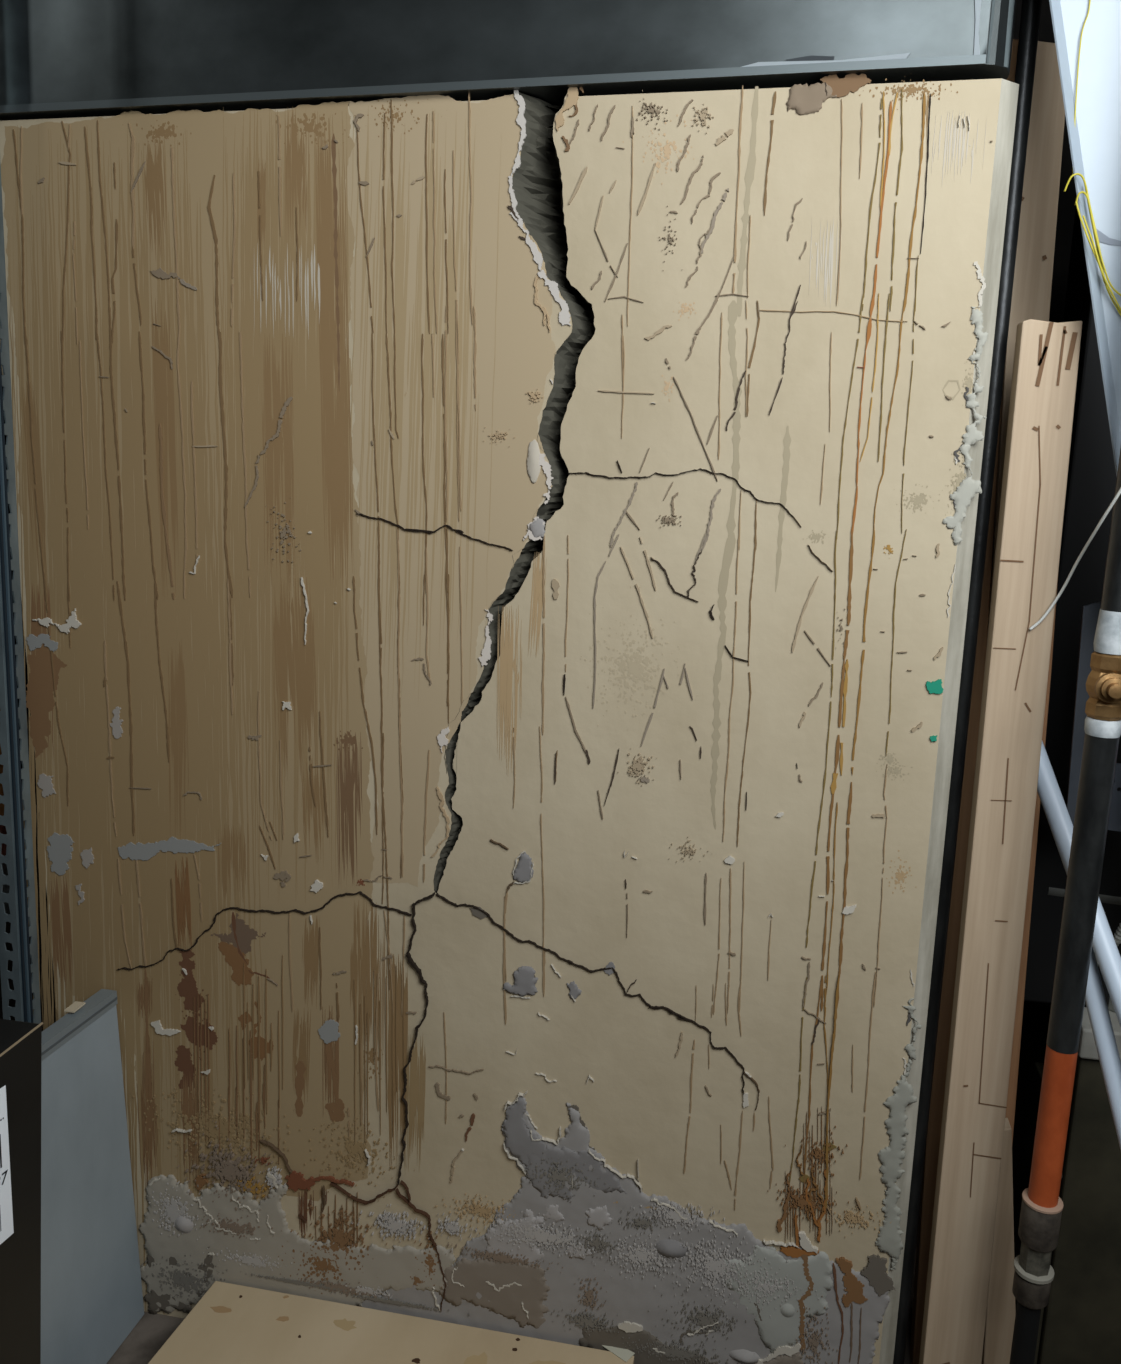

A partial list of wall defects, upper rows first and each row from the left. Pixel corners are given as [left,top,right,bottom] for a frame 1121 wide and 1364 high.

spalling [787,73,872,115]
spalling [943,261,988,545]
leakage [1,85,843,1364]
crack [117,92,832,1311]
corrosion [759,89,931,1364]
corrosion [175,857,279,1199]
corrosion [295,1061,306,1117]
corrosion [278,1170,372,1294]
corrosion [324,1006,345,1122]
spalling [139,1091,890,1364]
spalling [875,969,921,1270]